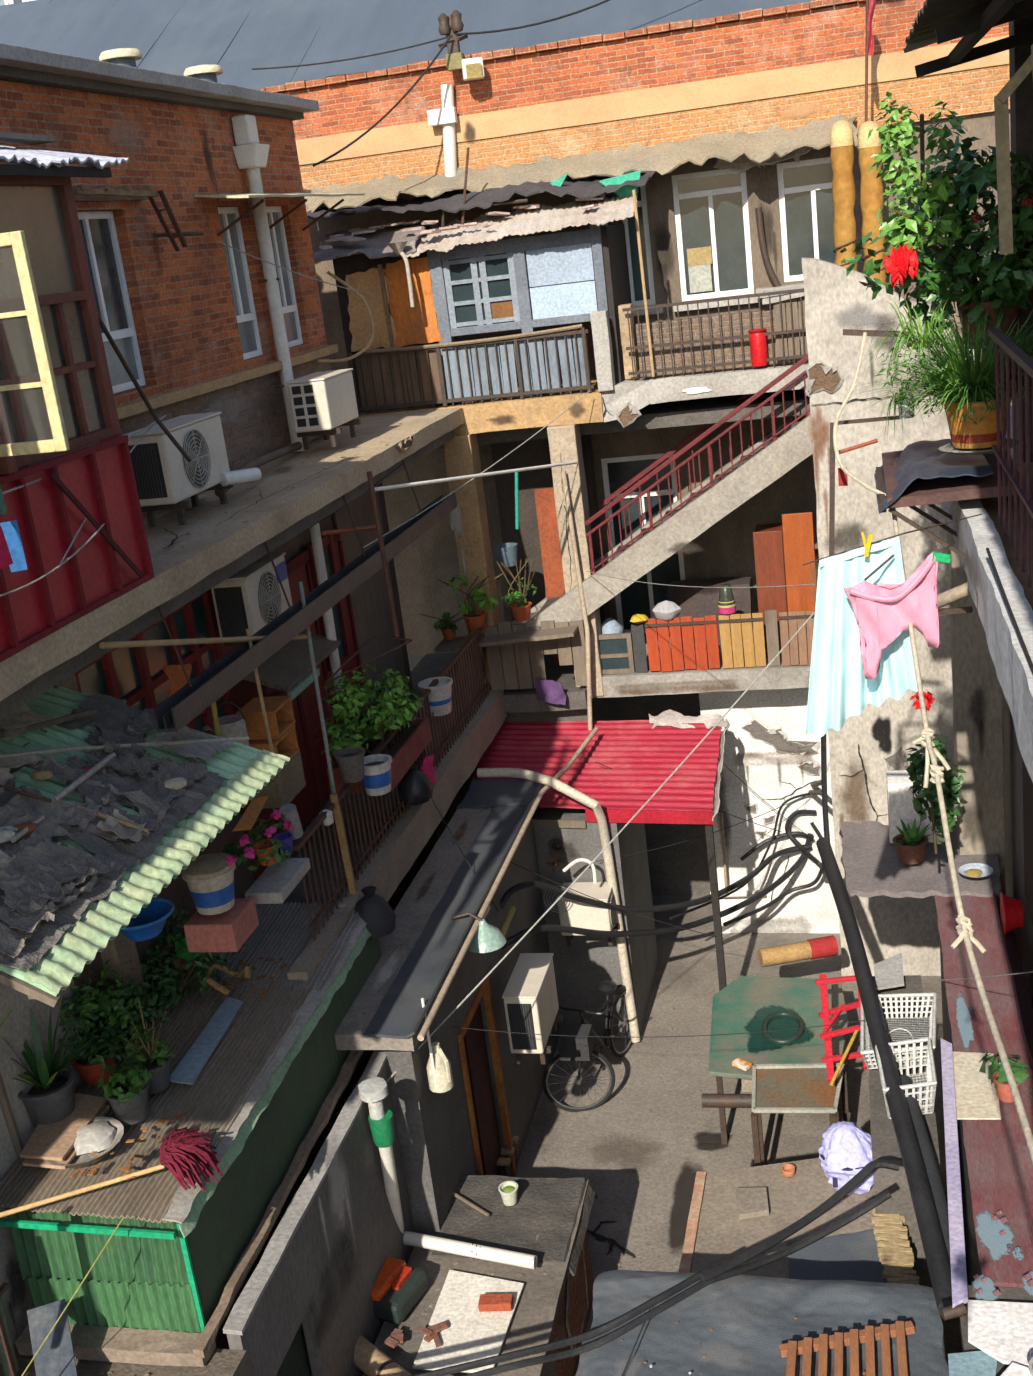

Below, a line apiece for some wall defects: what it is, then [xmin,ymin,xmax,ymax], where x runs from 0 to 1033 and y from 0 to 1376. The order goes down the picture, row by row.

spalling [805,361,844,397]
damp [319,1154,351,1247]